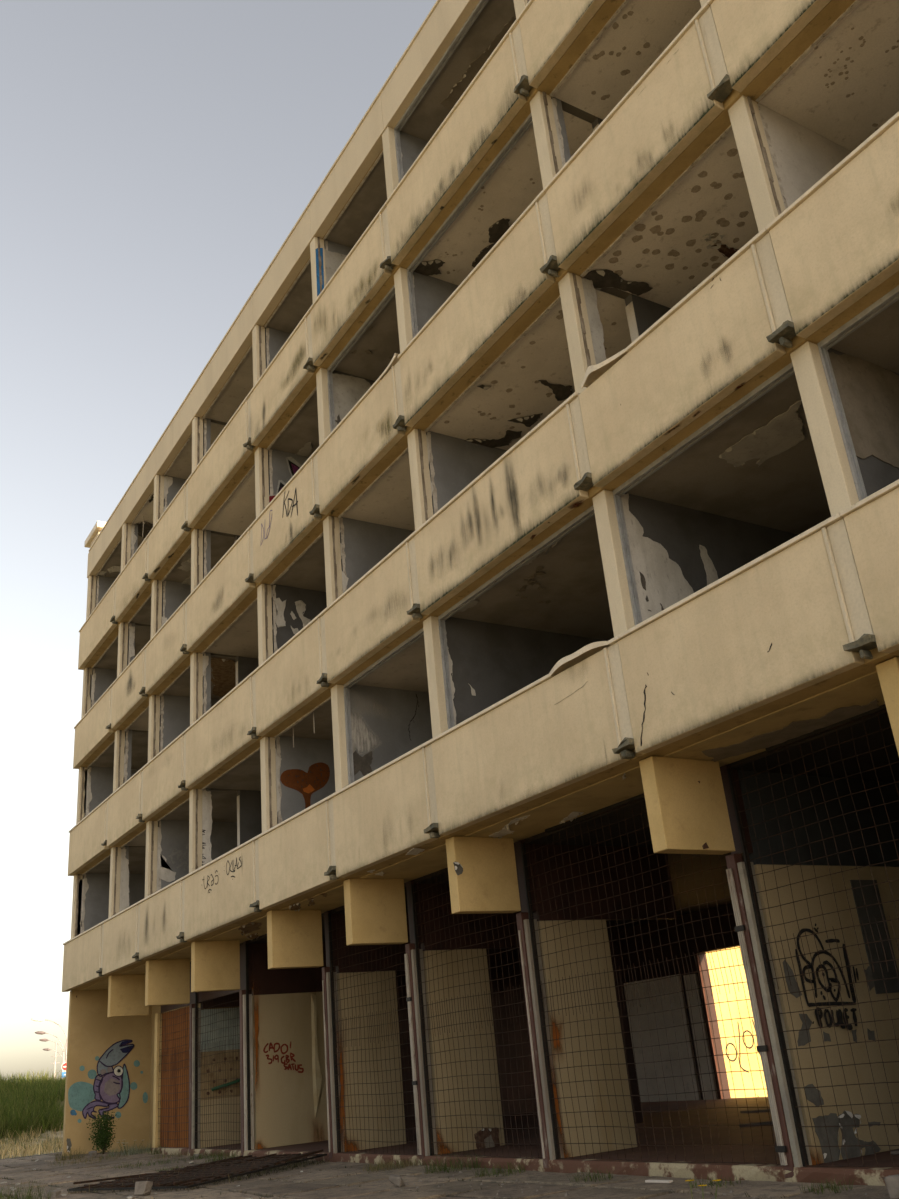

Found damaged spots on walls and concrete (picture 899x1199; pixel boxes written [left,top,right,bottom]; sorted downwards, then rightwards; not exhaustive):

spalling [472,212,523,268]
spalling [703,233,739,259]
flaking render [621,494,694,622]
flaking render [699,545,718,585]
flaking render [274,598,311,634]